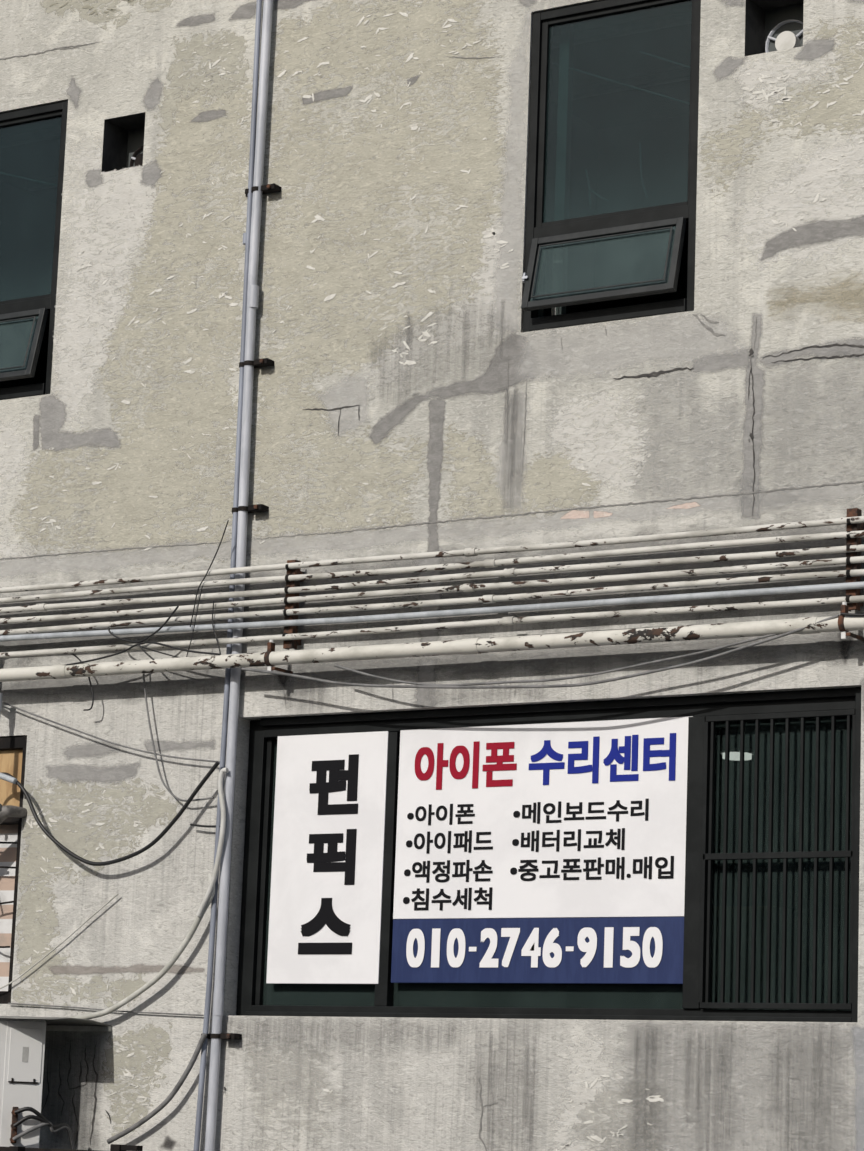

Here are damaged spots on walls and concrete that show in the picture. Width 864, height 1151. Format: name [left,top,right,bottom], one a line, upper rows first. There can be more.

crack [256,314,864,539]